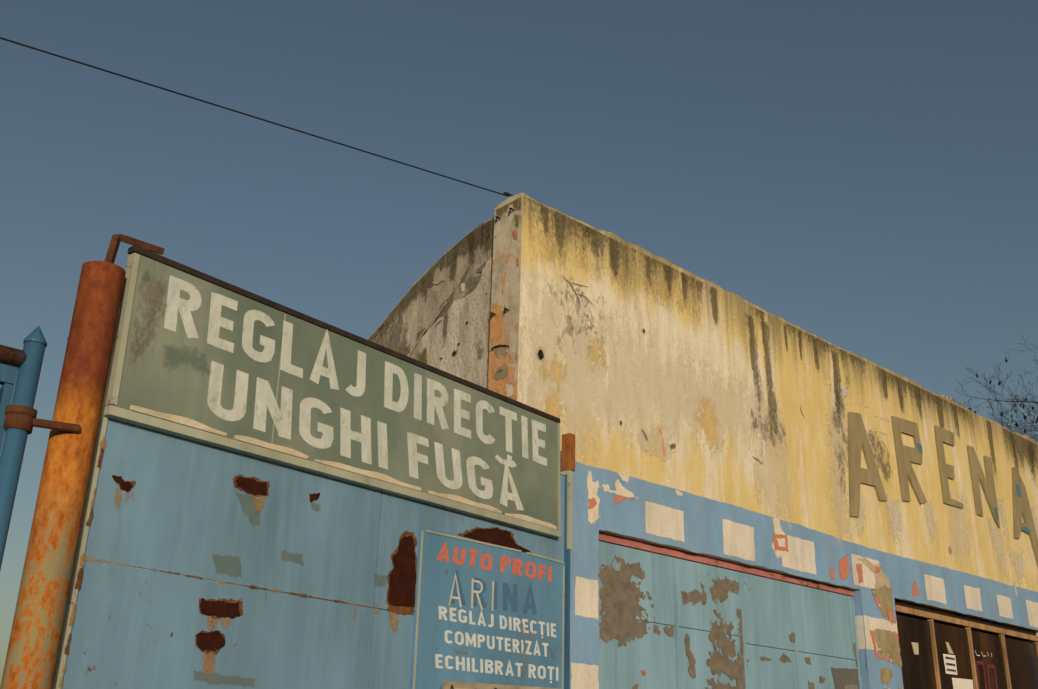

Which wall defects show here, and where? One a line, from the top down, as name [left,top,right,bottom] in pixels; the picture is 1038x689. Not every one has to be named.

damp [370,197,522,364]
peeling [416,253,519,401]
damp [540,203,718,323]
damp [745,308,786,446]
damp [784,324,866,492]
rust [59,605,76,688]
rust [75,555,203,590]
rust [250,585,369,617]
rust [387,531,417,615]
peeling [598,555,791,689]
peeling [808,643,862,689]
flaking render [829,555,902,689]